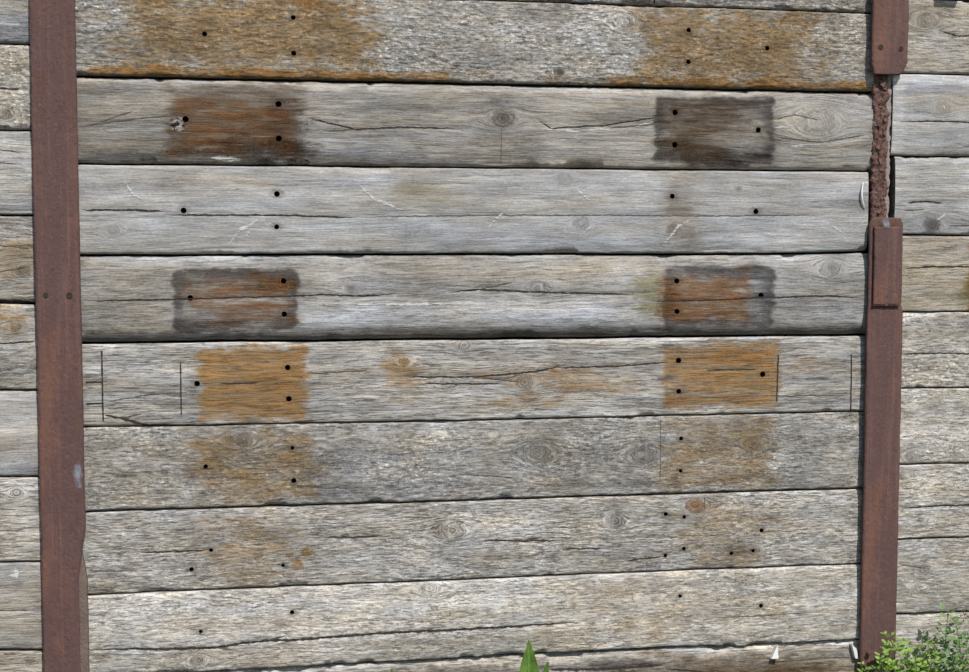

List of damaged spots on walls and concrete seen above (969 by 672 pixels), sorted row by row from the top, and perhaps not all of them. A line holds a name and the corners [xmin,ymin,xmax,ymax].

crack [540,116,666,129]
corrosion [867,75,891,225]